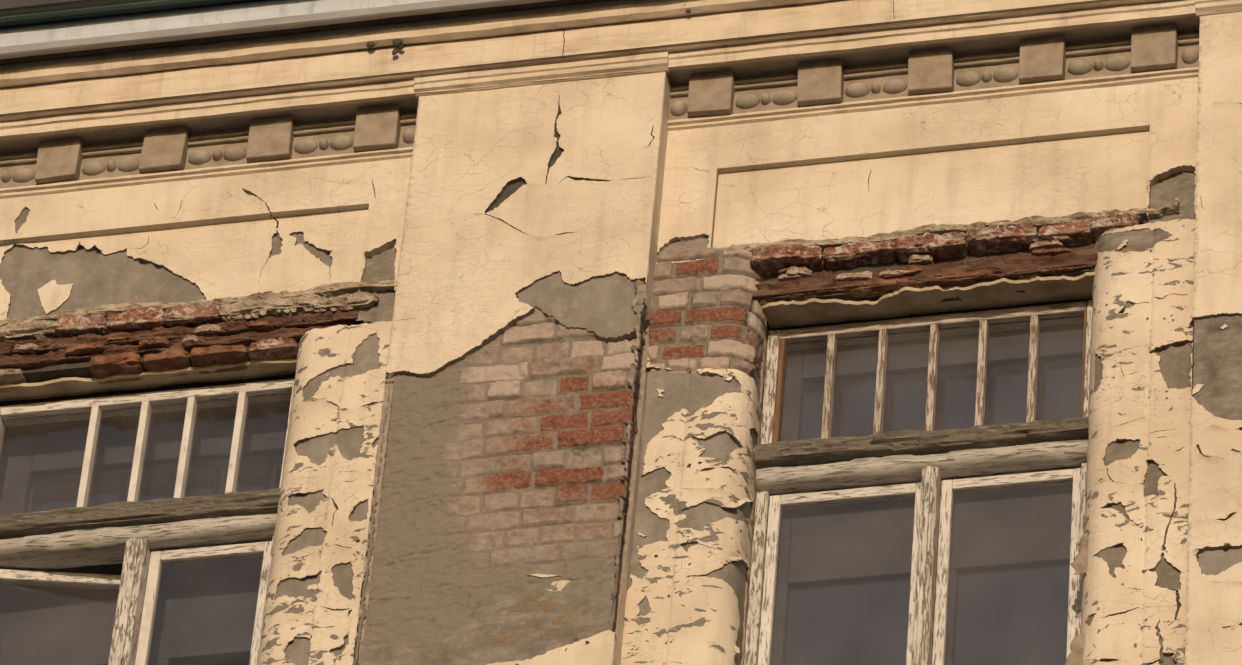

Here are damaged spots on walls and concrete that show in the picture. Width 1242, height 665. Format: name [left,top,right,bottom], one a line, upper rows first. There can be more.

crack [488,104,591,222]
crack [243,190,279,233]
peeling [0,208,206,319]
peeling [1094,354,1103,392]
peeling [1153,315,1242,420]
flaking render [276,231,768,665]
peeling [1104,437,1167,497]
peeling [1100,500,1132,522]
peeling [1071,533,1141,578]
peeling [1142,555,1181,593]
peeling [1192,542,1242,575]
crack [1169,589,1181,618]